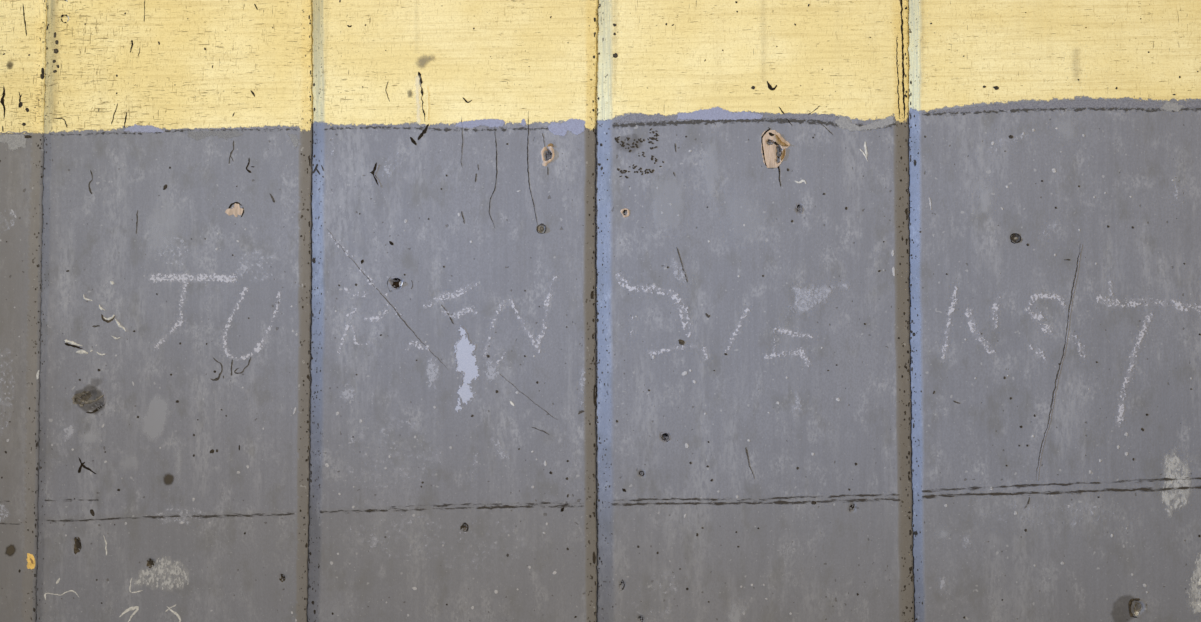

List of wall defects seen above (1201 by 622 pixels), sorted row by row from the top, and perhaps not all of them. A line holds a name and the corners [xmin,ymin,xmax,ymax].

peeling [615,106,895,178]
peeling [454,325,489,417]
crack [1036,246,1082,481]